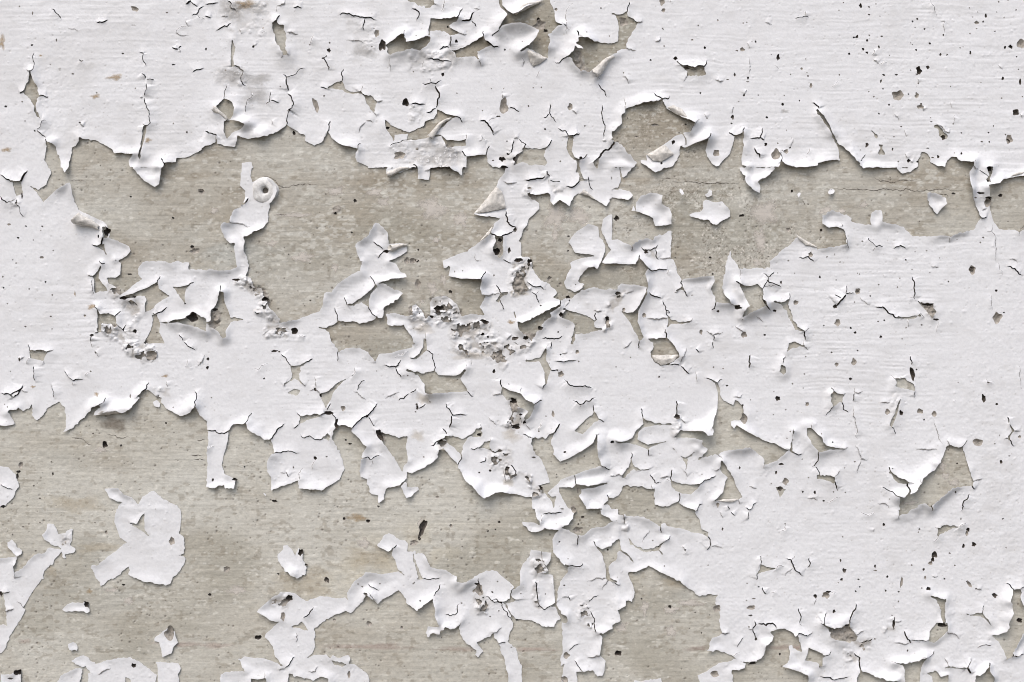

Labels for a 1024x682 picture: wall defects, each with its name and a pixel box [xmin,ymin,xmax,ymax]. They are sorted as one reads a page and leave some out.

crack [340,12,374,41]
crack [412,0,477,26]
peeling [0,37,1024,415]
crack [386,352,464,428]
crack [542,336,594,405]
crack [695,316,762,379]
peeling [883,417,1021,519]
peeling [0,350,997,682]
peeling [963,583,1024,662]